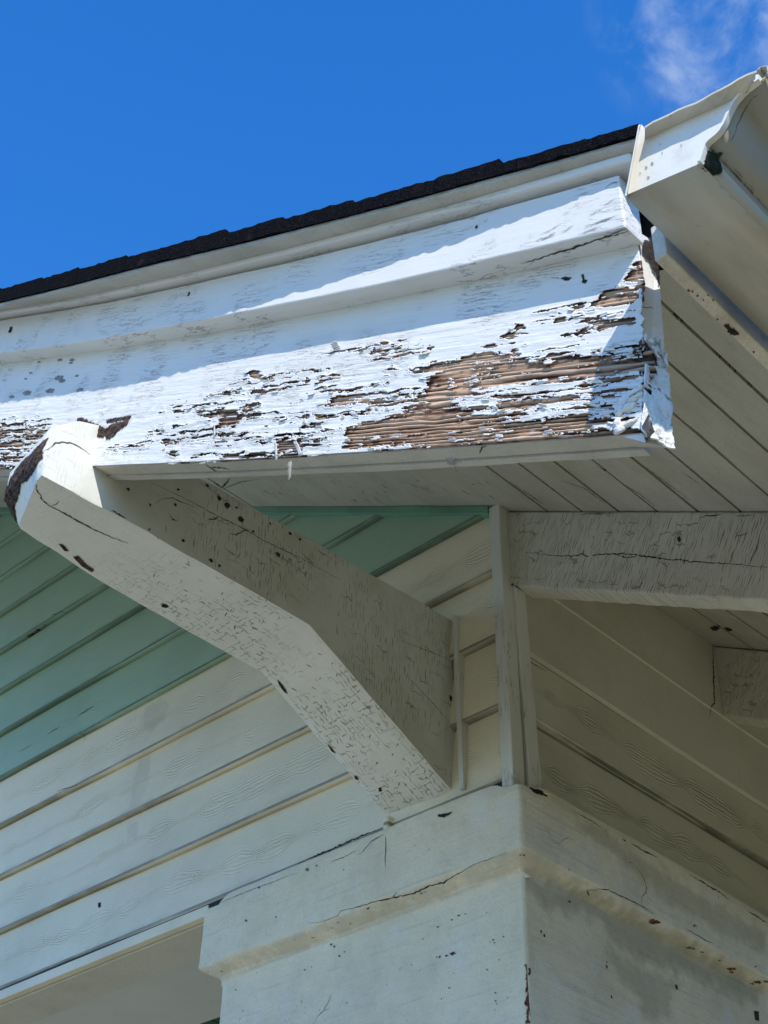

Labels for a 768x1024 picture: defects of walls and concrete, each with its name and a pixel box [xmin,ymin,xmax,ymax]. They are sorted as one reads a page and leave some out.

crack [526,229,628,263]
peeling [46,358,83,393]
peeling [110,261,676,464]
peeling [0,418,52,469]
crack [35,484,127,543]
crack [514,518,766,592]
crack [319,854,503,923]